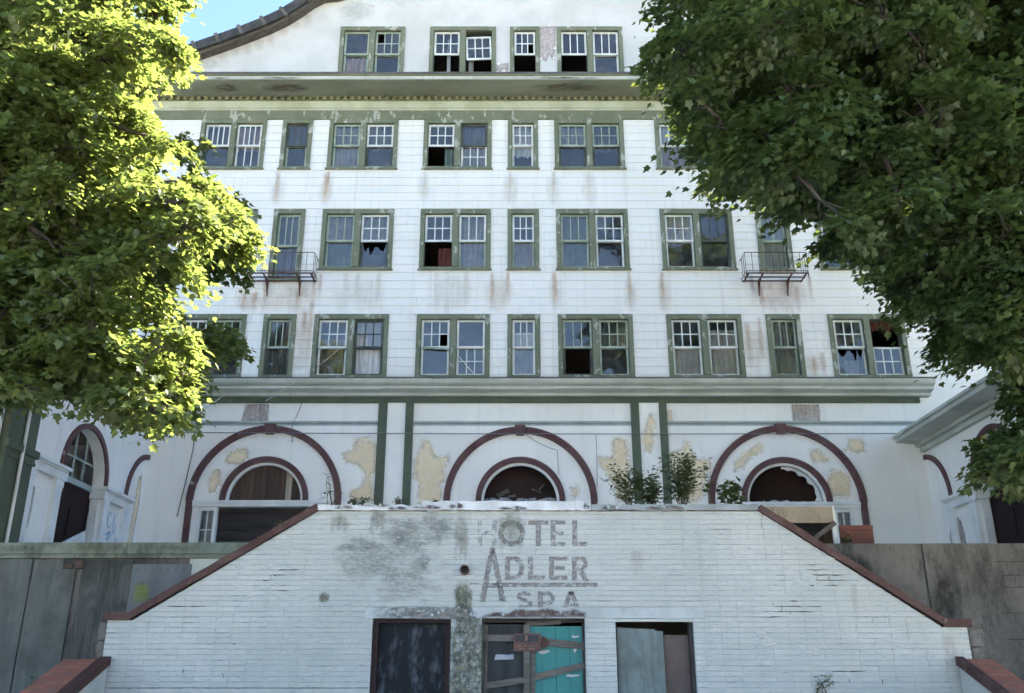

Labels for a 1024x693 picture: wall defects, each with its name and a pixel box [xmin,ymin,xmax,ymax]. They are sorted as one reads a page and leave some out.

flaking render [539,25,556,60]
peeling [206,449,249,496]
peeling [335,435,463,512]
peeling [599,439,632,510]
peeling [733,441,761,472]
peeling [809,449,853,498]